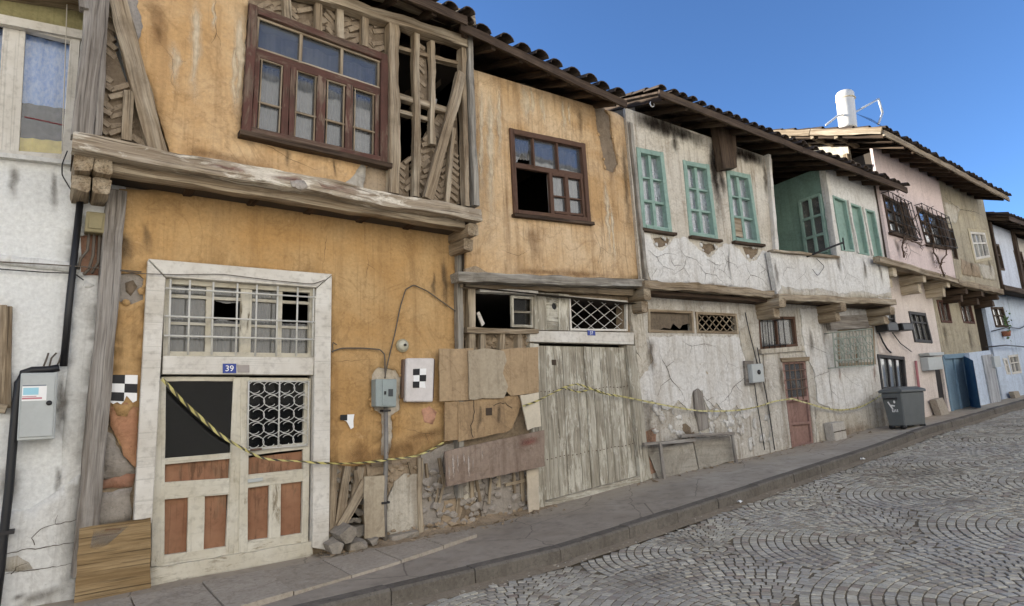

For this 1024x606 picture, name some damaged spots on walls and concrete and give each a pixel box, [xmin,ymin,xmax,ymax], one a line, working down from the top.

spalling [595,108,619,173]
damp [643,114,690,148]
spalling [654,236,669,247]
spalling [699,242,718,254]
crack [654,249,811,288]
spalling [743,247,757,259]
spalling [119,273,146,306]
crack [660,344,744,417]
peeling [99,403,139,525]